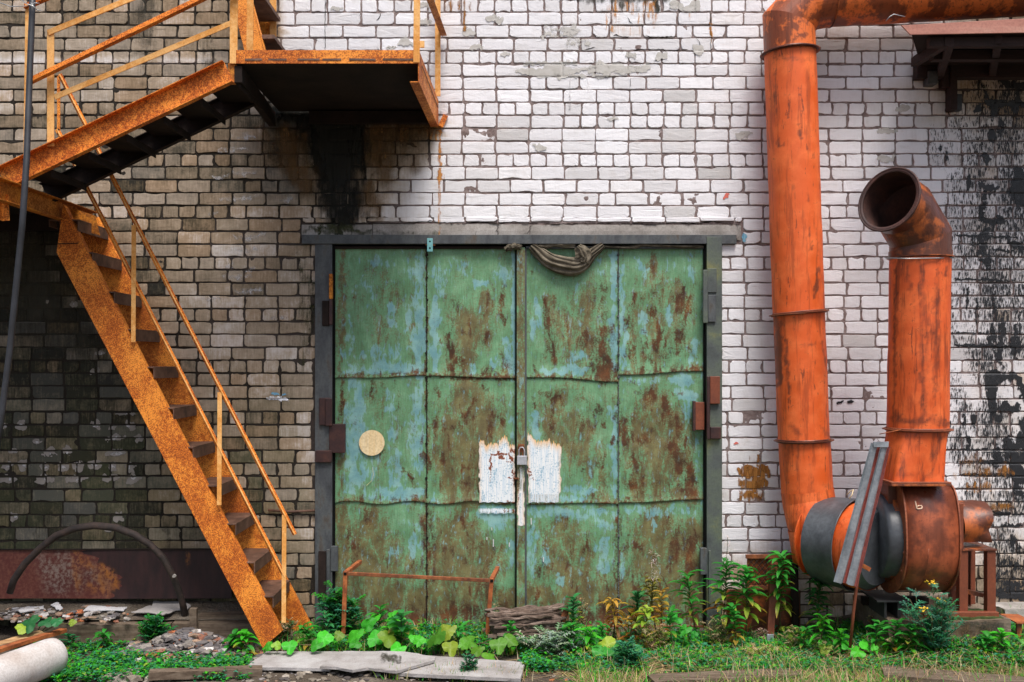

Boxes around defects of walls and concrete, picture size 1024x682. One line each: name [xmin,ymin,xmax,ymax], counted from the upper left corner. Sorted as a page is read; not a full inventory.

peeling [523,59,609,79]
leakage [982,88,1020,170]
leakage [272,107,436,235]
leakage [978,190,987,218]
leakage [966,287,1022,365]
leakage [949,413,977,452]
leakage [992,435,1014,469]
rust [737,455,771,502]